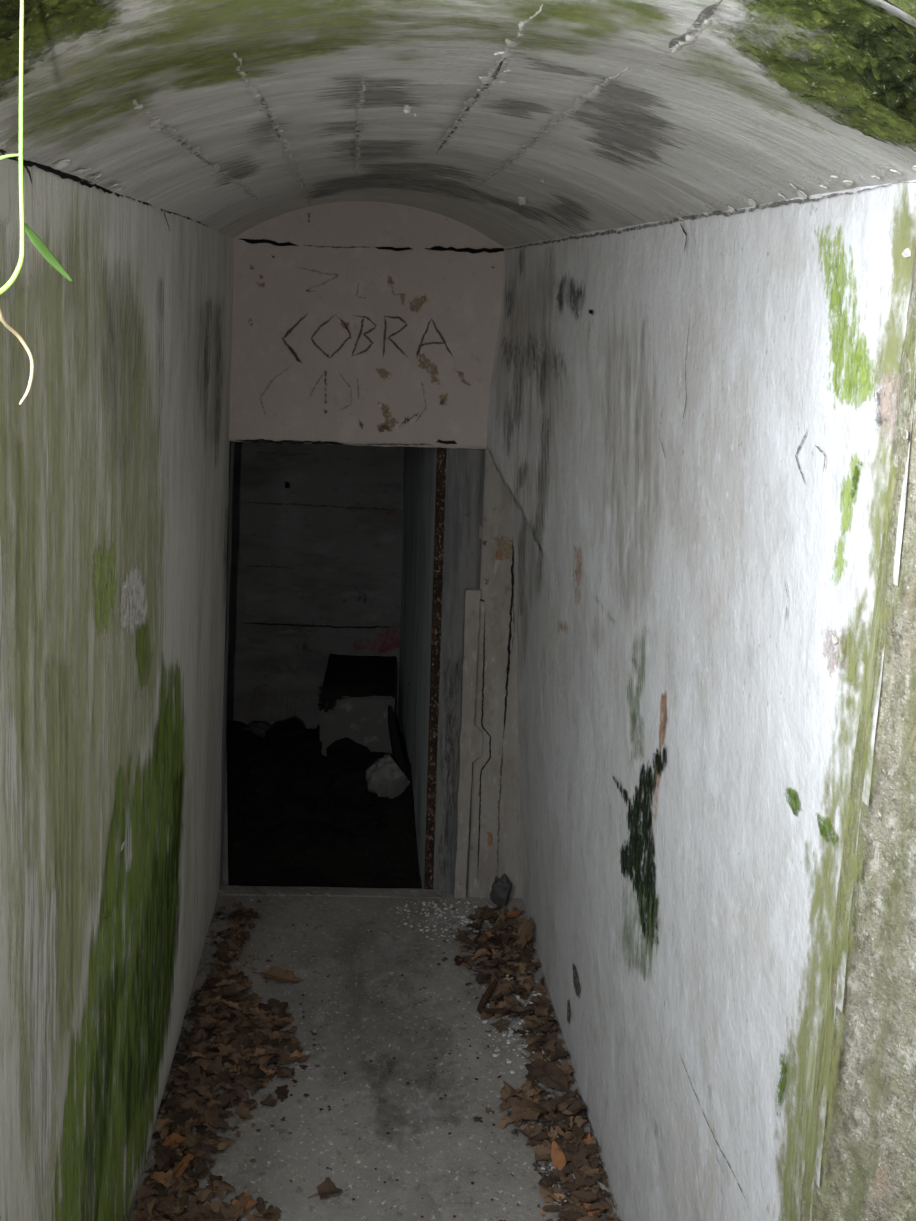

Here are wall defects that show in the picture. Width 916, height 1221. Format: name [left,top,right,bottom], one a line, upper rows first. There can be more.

water stain [318,77,423,116]
crack [433,5,543,157]
water stain [487,100,551,119]
water stain [514,52,680,169]
crack [0,149,207,231]
water stain [301,124,594,235]
crack [240,182,916,272]
water stain [830,261,868,394]
water stain [82,625,185,1221]
water stain [622,891,657,978]